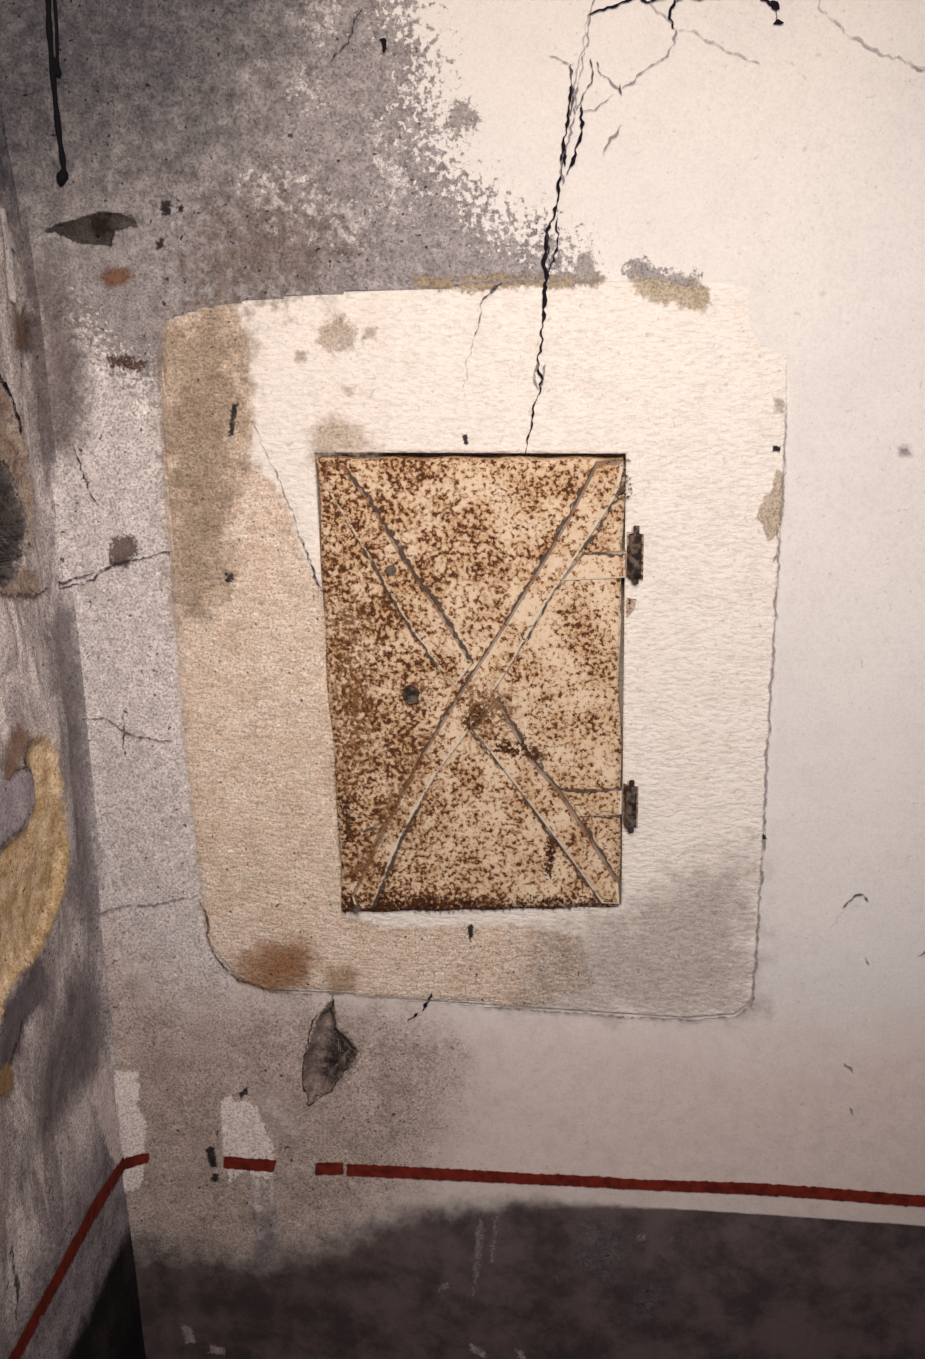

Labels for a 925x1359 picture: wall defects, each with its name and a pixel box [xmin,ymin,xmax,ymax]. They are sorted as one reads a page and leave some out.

crack [761,0,784,25]
crack [818,1,925,71]
damp [443,97,481,141]
crack [525,0,759,455]
damp [413,251,604,293]
damp [621,256,709,311]
damp [0,208,85,478]
crack [463,283,502,386]
rust [613,458,632,502]
peeling [0,0,600,1106]
rust [324,593,614,914]
flaking render [205,1146,219,1182]